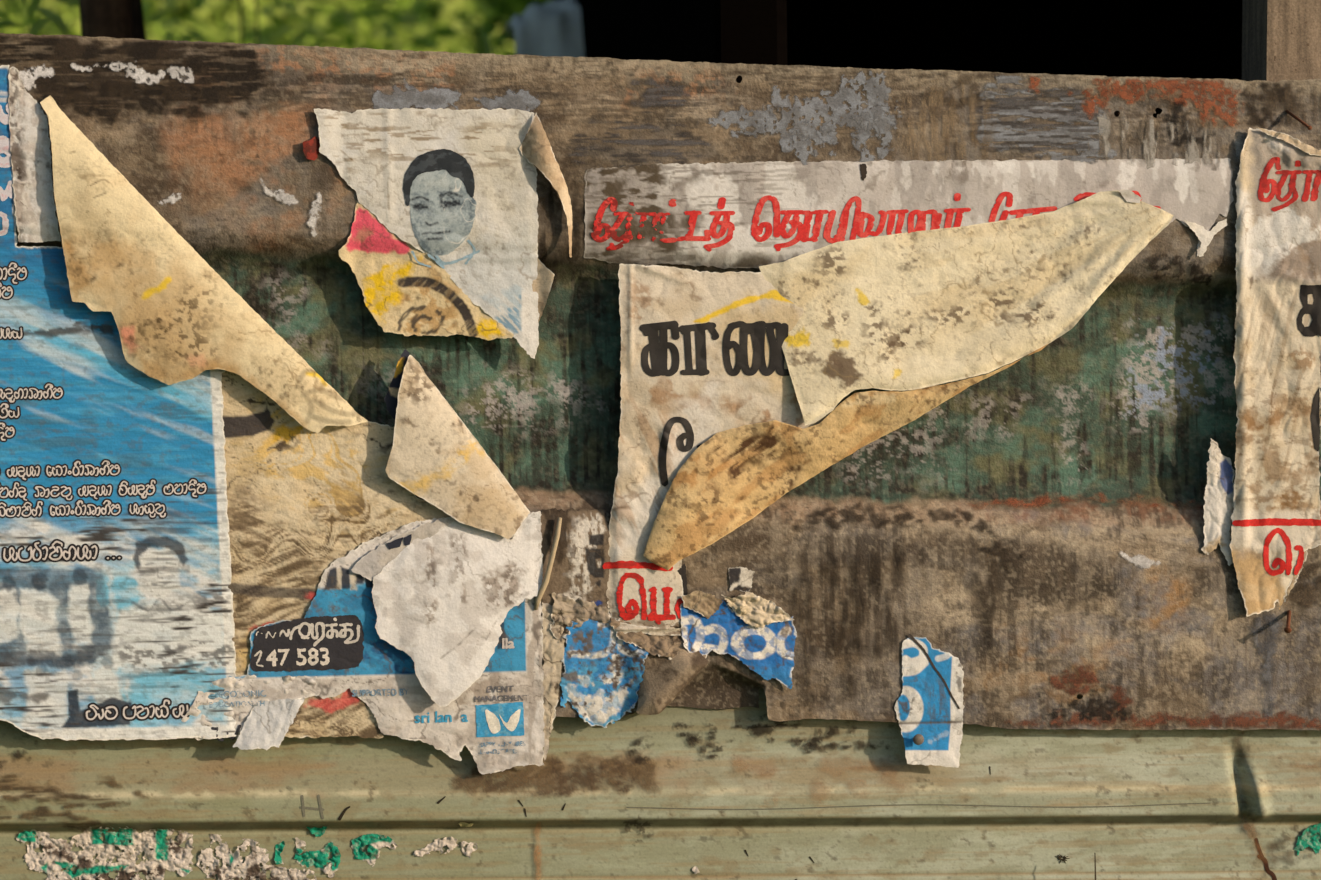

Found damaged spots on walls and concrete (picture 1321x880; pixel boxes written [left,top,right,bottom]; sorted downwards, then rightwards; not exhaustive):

peeling [19,66,54,90]
peeling [71,62,194,84]
peeling [569,71,903,168]
corrosion [1069,78,1238,126]
damp [795,503,1023,568]
damp [793,553,903,654]
damp [1293,563,1321,608]